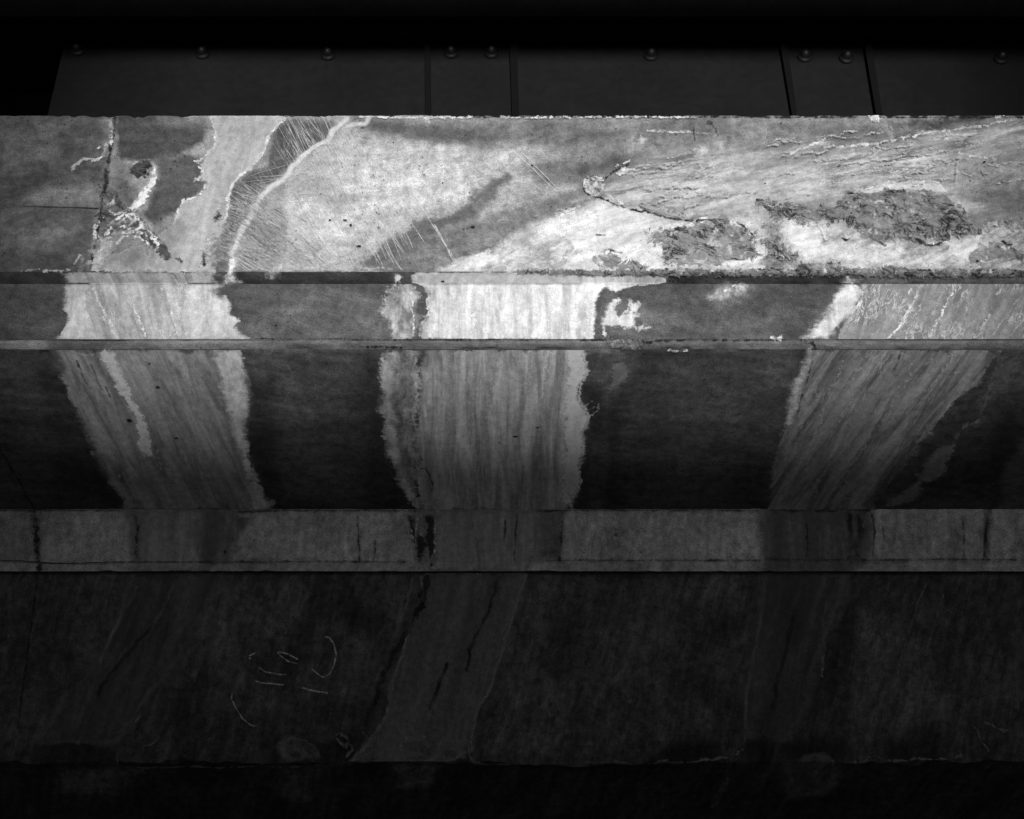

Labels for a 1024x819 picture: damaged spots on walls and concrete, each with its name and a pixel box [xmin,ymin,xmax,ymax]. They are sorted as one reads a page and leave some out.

crack [31,116,117,269]
spalling [92,188,182,263]
spalling [517,186,1024,279]
damp [21,116,370,743]
damp [123,115,1024,769]